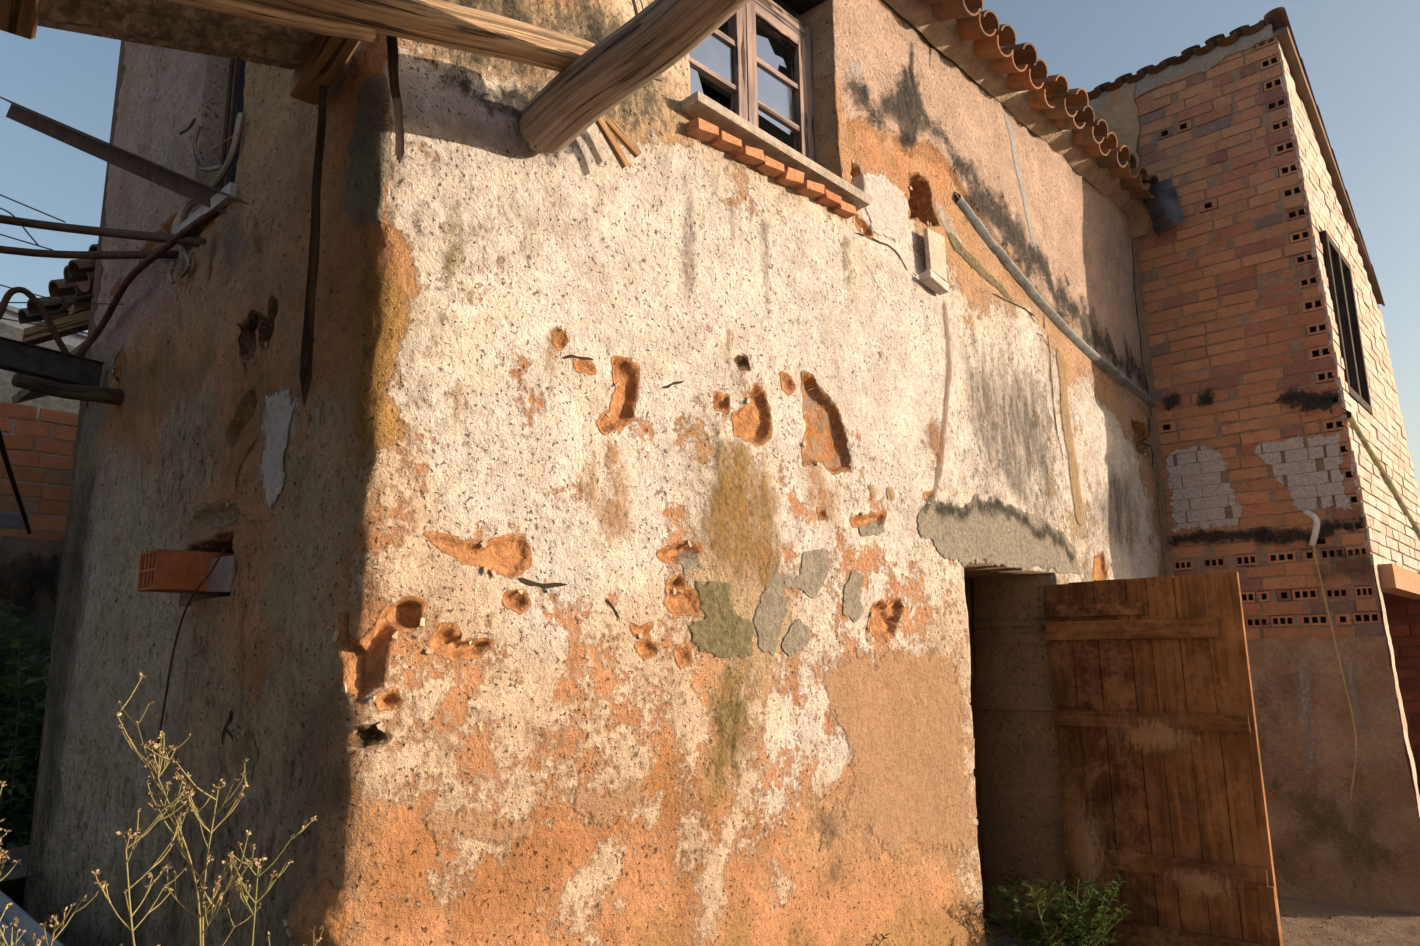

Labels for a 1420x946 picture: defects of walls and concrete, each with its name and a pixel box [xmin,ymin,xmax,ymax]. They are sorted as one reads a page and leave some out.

flaking render [908,172,940,227]
leakage [849,43,1181,411]
flaking render [424,531,532,615]
flaking render [553,325,640,435]
flaking render [657,539,703,617]
flaking render [713,355,852,475]
leakage [924,300,1075,563]
leakage [1057,349,1084,526]
leakage [1168,516,1365,546]
peeling [1254,431,1352,512]
flaking render [332,596,494,748]
flaking render [808,598,973,865]